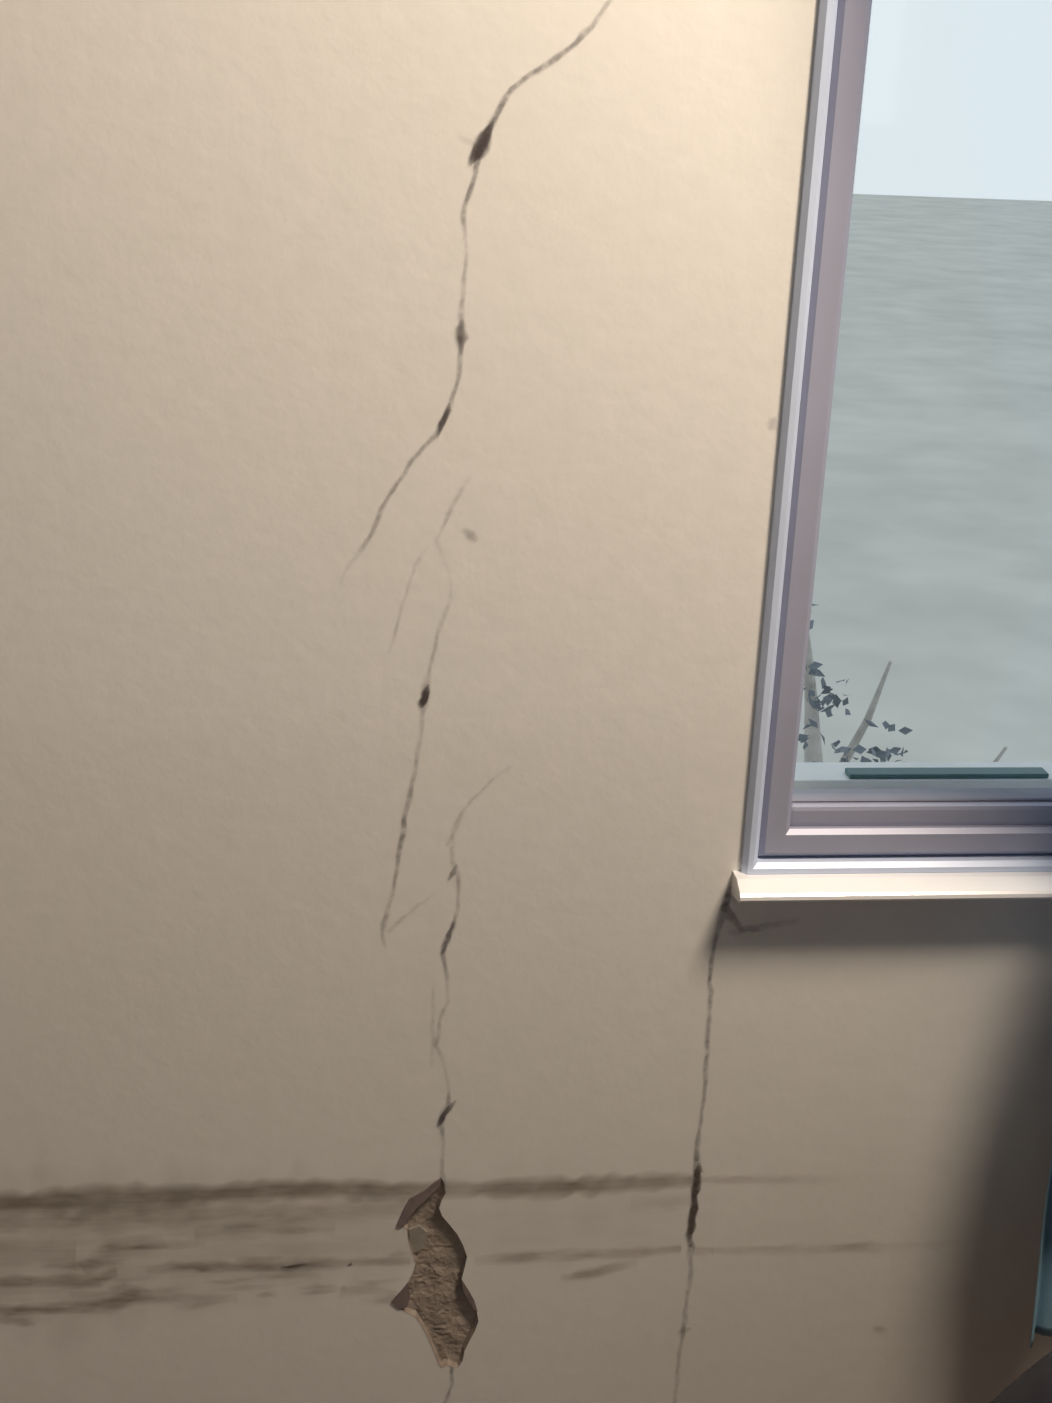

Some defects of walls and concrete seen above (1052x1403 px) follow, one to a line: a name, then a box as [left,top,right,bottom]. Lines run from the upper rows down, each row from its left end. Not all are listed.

crack [470,104,504,161]
crack [439,409,449,429]
crack [420,687,429,706]
crack [439,1106,451,1123]
water stain [0,1194,81,1208]
water stain [168,1185,331,1201]
crack [687,1157,701,1245]
flaking render [391,1177,478,1368]